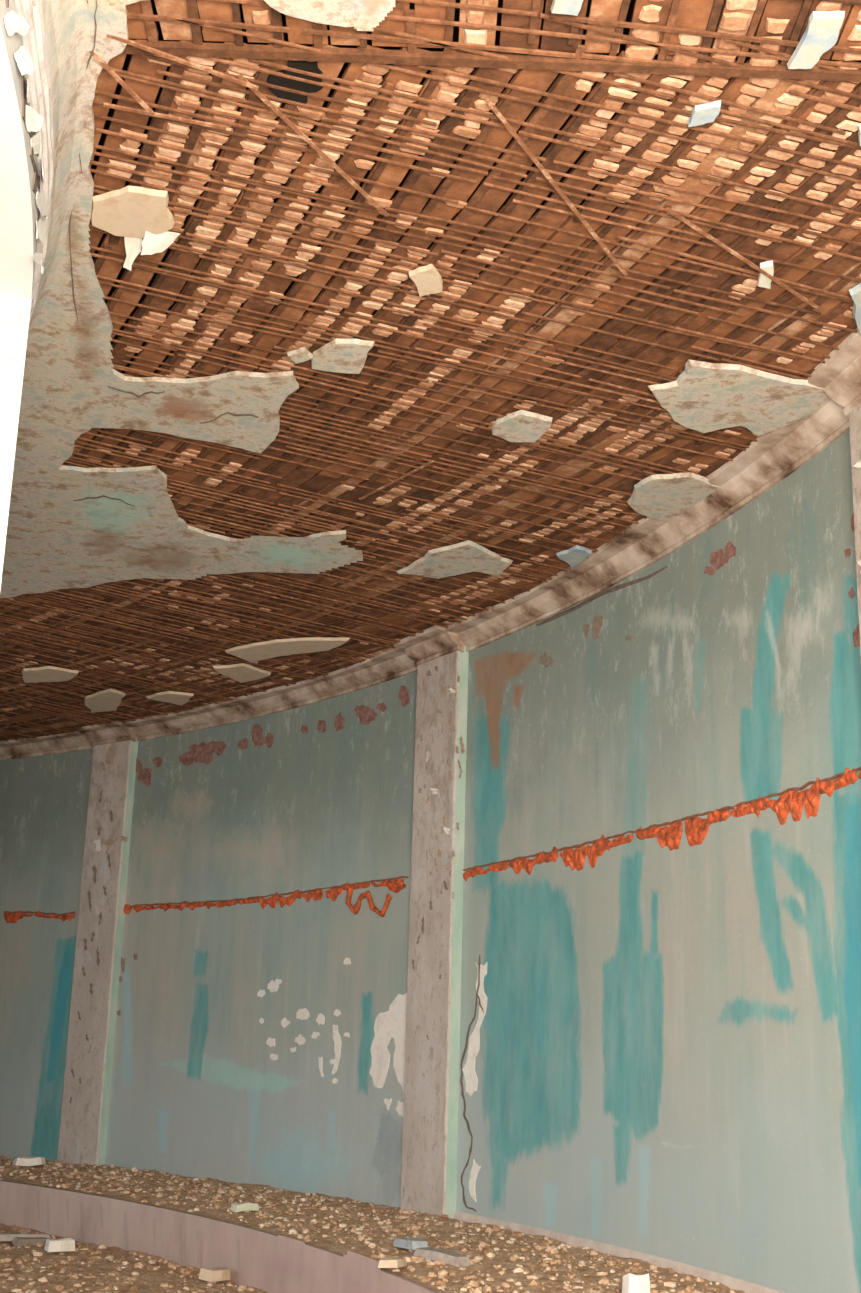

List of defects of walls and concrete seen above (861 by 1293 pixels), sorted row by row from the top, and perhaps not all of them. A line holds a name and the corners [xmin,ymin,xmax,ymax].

peeling [264,0,395,31]
spalling [267,60,323,104]
peeling [0,0,313,598]
peeling [307,530,346,543]
peeling [704,542,736,575]
peeling [146,691,194,706]
peeling [213,663,271,683]
corrosion [471,643,540,768]
flaking render [300,666,861,944]
peeling [259,1008,350,1084]
flaking render [369,993,407,1117]
crack [460,955,484,1212]